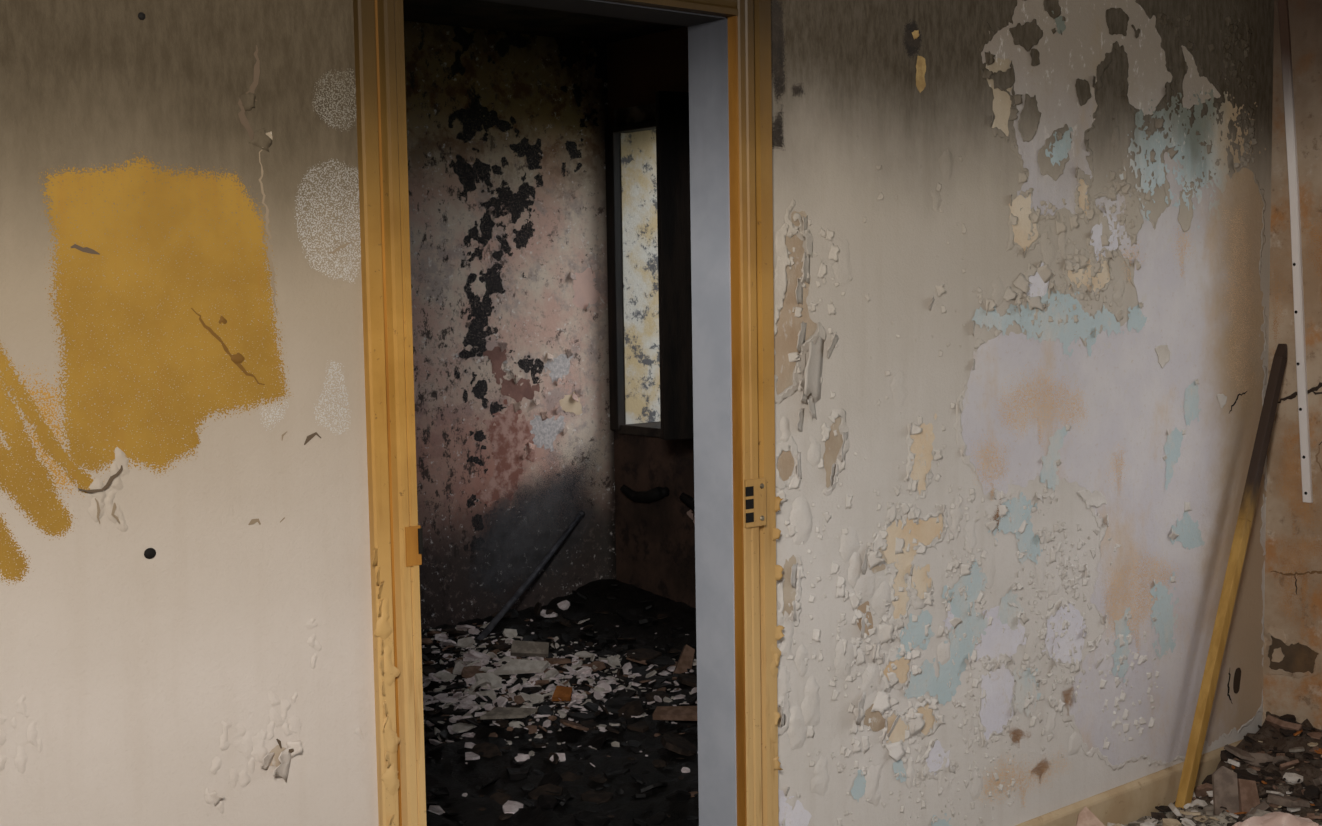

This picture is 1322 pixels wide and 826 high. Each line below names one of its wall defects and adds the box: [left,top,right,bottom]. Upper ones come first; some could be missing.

peeling [570,264,601,312]
peeling [769,0,1322,781]
peeling [474,342,584,508]
peeling [778,786,811,826]
spalling [1112,791,1240,826]
spalling [1253,773,1322,816]